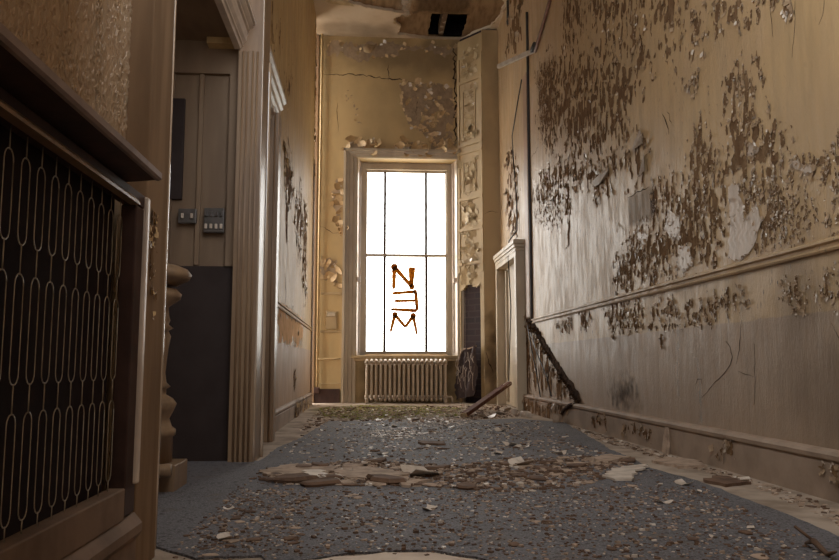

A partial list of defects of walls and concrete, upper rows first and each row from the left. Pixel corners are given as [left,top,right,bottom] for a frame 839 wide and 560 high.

peeling [503,0,523,60]
crack [324,66,418,119]
peeling [329,178,349,236]
peeling [341,43,482,288]
peeling [503,150,521,239]
peeling [531,0,839,349]
peeling [277,296,304,349]
crack [696,327,755,396]